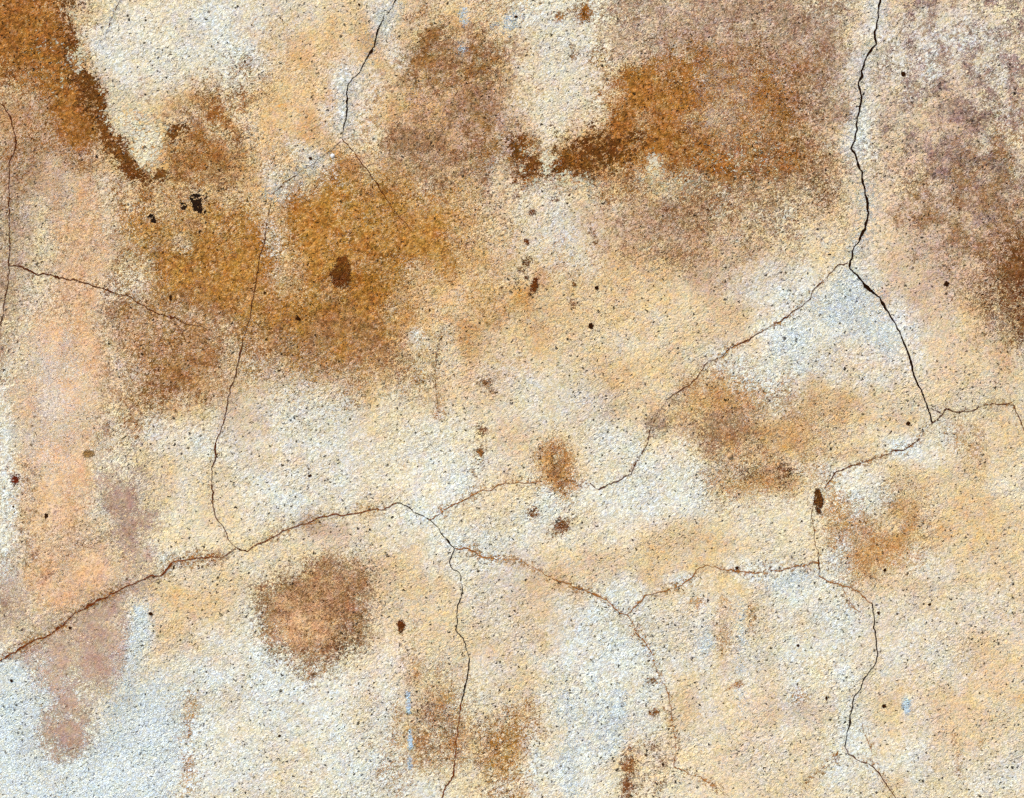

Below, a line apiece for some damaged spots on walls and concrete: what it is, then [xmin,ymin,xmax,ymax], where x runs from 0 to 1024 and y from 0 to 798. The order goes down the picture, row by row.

crack [0,102,216,334]
crack [97,0,128,42]
crack [256,0,405,279]
rust [0,0,880,420]
crack [549,0,1024,490]
crack [0,283,896,798]
rust [525,427,587,543]